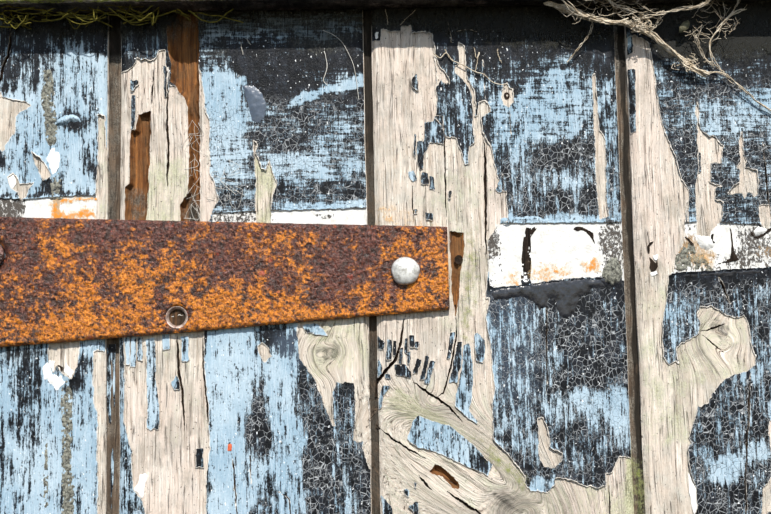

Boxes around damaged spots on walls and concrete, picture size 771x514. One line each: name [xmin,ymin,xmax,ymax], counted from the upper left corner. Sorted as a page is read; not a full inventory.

peeling [0,114,108,219]
corrosion [50,197,97,219]
peeling [94,350,106,514]
peeling [120,50,190,221]
peeling [124,331,210,514]
crack [233,456,251,514]
crack [375,319,405,397]
peeling [199,26,634,514]
crack [543,307,551,391]
peeling [626,35,771,514]
crack [701,324,724,352]
crack [743,383,751,514]